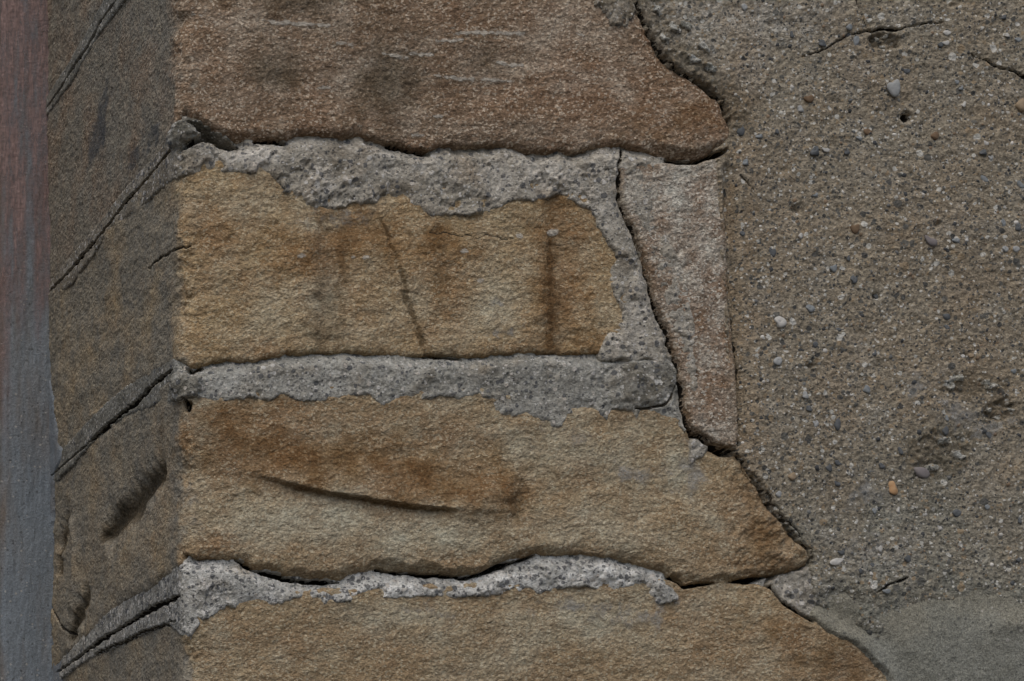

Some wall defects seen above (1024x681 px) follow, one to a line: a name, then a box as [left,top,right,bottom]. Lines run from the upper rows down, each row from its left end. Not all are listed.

crack [802,0,935,57]
crack [982,59,1024,79]
crack [148,245,191,269]
crack [615,150,813,557]
crack [53,609,78,635]
crack [98,620,172,654]